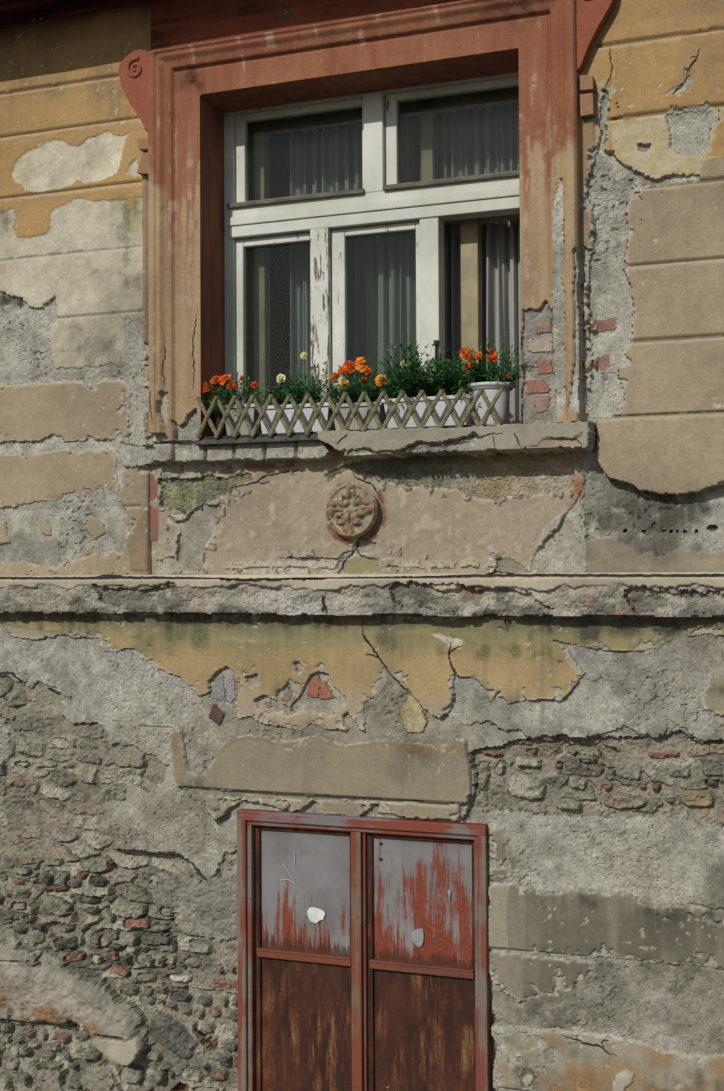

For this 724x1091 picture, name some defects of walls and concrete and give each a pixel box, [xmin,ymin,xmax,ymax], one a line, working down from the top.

crack [667,48,700,97]
peeling [0,130,201,567]
spalling [222,88,724,574]
spalling [158,472,253,513]
crack [337,431,583,495]
crack [0,537,724,613]
crack [0,671,60,694]
crack [355,615,411,695]
crack [448,642,463,676]
flaking render [0,627,724,1091]